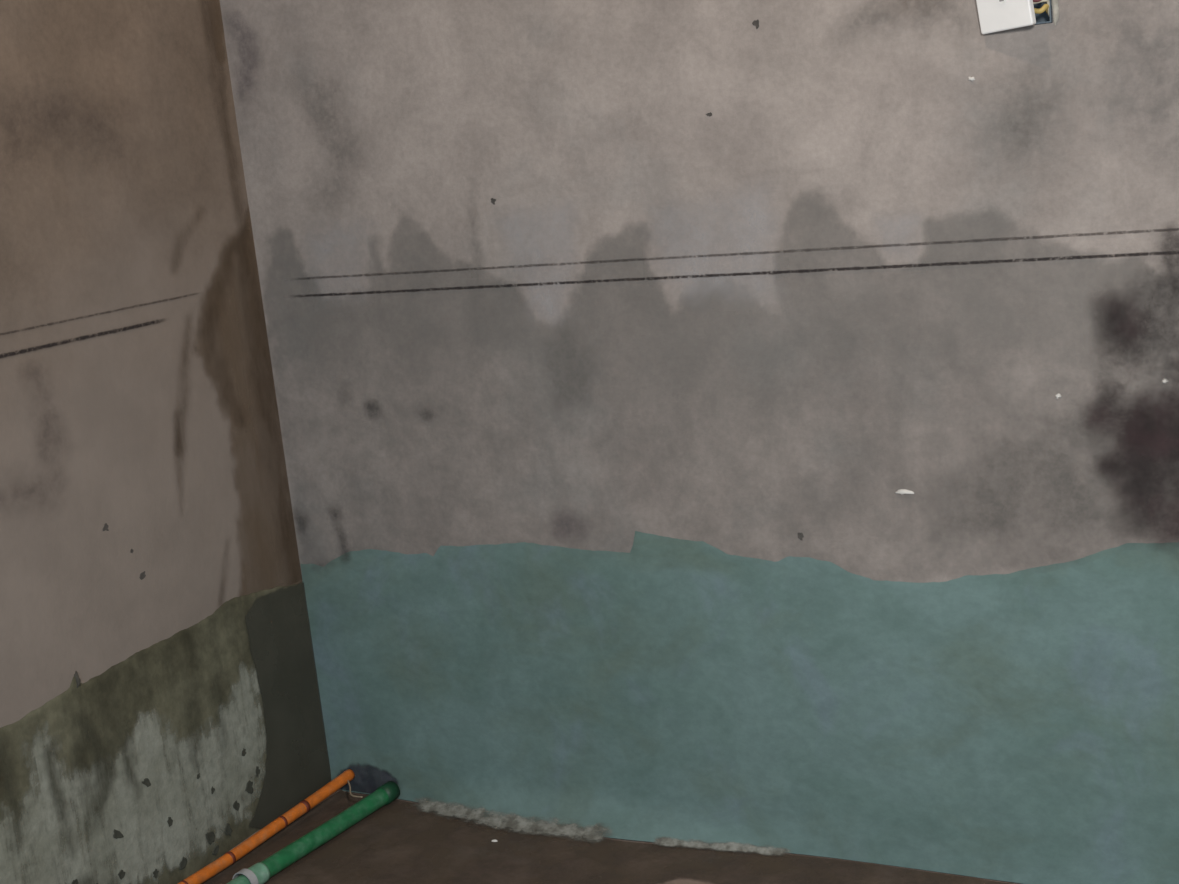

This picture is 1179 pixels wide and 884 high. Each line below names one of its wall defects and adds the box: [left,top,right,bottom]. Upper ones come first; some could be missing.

water stain [203,211,272,474]
water stain [1091,398,1179,540]
water stain [0,503,368,884]
water stain [264,799,1010,884]